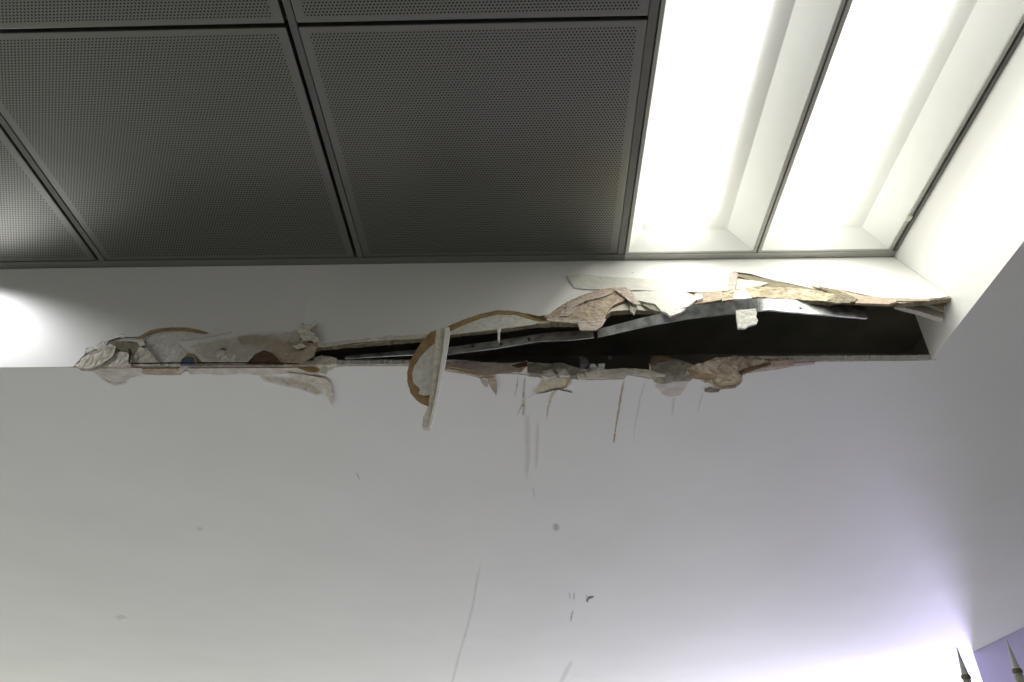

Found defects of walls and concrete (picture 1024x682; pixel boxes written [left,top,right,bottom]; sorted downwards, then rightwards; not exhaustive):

flaking render [566,274,930,330]
flaking render [75,327,333,406]
spalling [585,368,688,397]